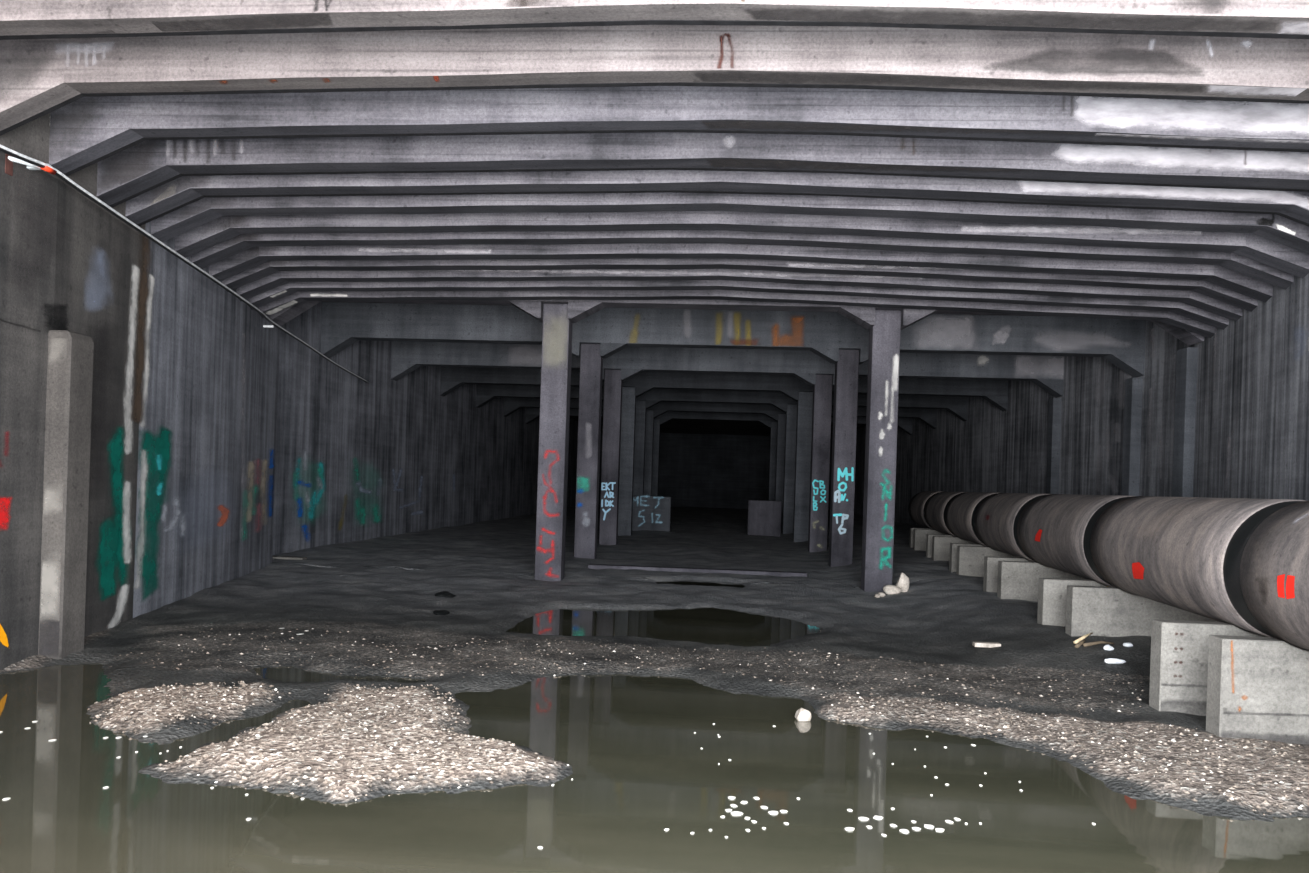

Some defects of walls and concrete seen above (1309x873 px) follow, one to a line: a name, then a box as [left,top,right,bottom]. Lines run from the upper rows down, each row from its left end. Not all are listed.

rust [717,33,733,69]